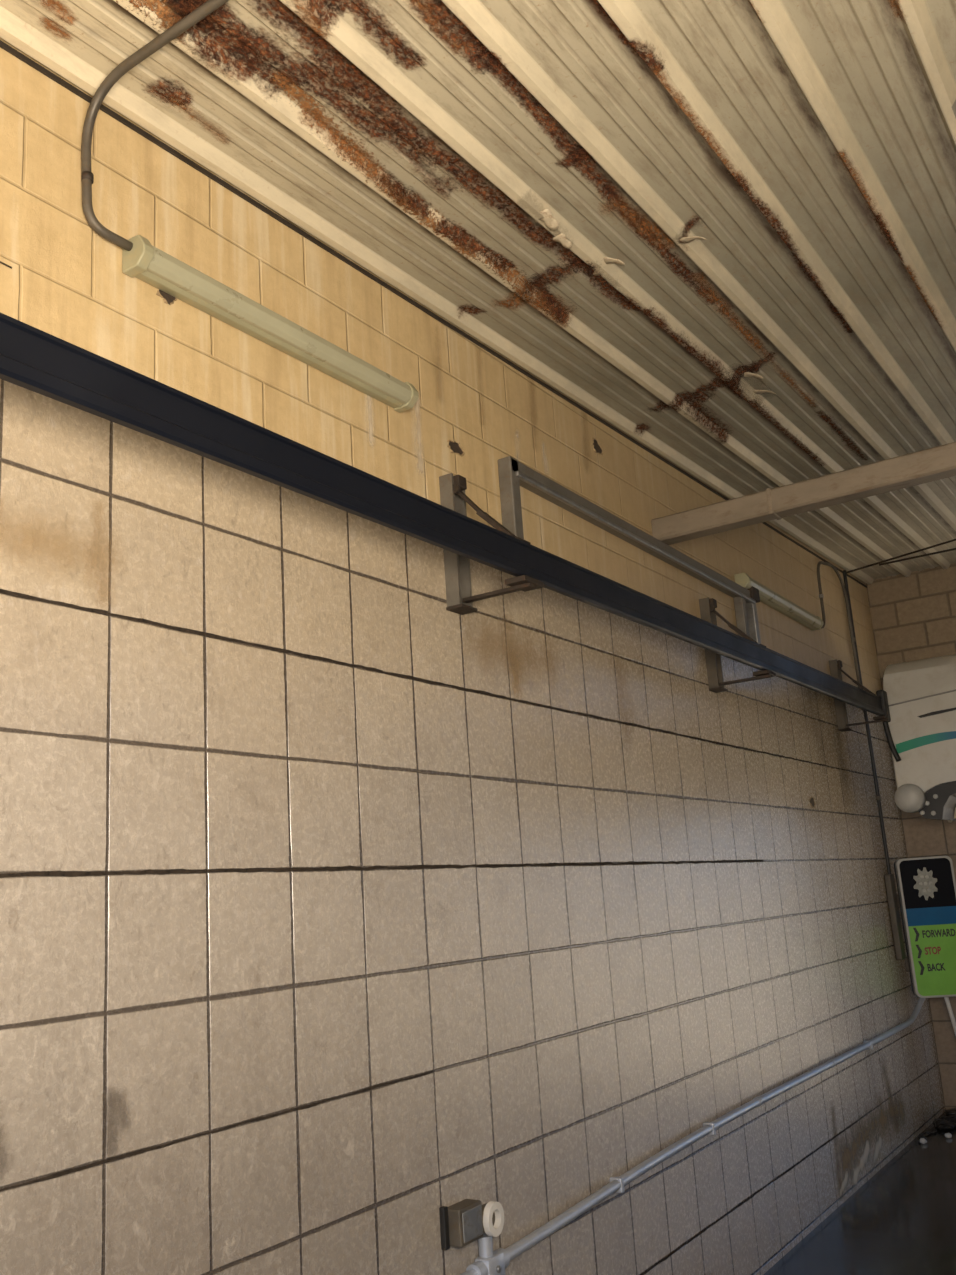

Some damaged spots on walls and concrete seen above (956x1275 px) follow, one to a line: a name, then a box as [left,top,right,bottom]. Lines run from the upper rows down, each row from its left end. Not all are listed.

rust [42,0,74,39]
rust [116,0,868,466]